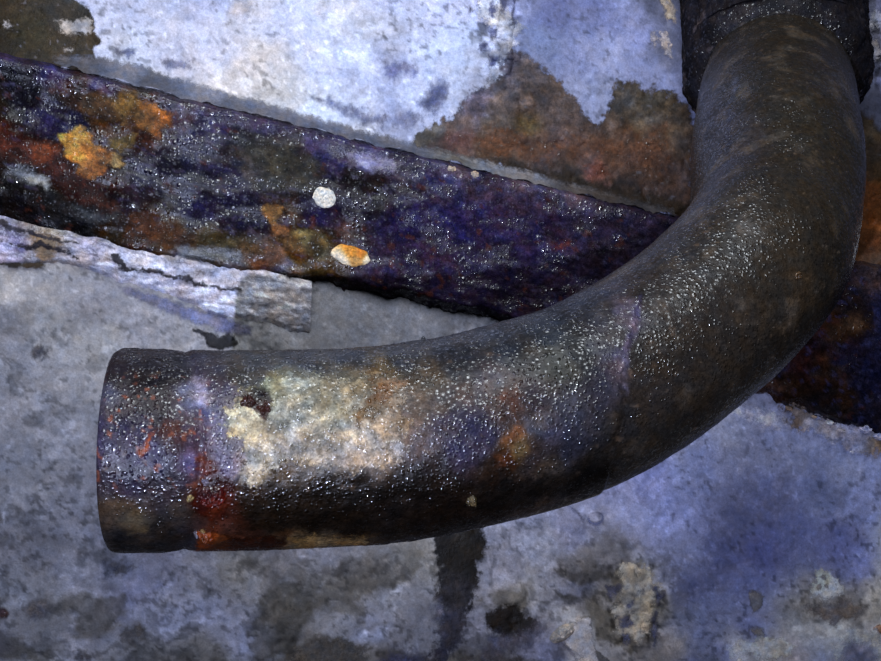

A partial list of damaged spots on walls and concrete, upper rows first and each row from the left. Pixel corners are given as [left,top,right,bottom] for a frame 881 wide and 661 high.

rust [414,47,695,216]
rust [0,91,333,264]
rust [352,378,406,428]
rust [494,429,526,469]
rust [192,455,235,521]
rust [194,532,287,552]
damp [428,528,487,661]